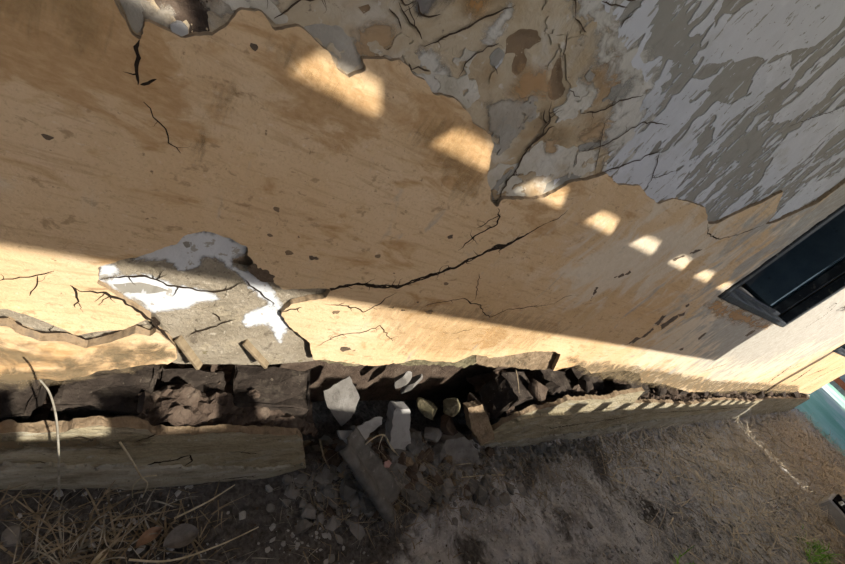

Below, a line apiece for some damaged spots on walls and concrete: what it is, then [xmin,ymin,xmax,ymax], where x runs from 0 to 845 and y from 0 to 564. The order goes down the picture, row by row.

crack [562,0,586,58]
crack [602,0,635,27]
crack [125,40,191,152]
peeling [116,0,845,222]
crack [319,90,673,346]
spalling [0,309,117,339]
spalling [99,231,361,366]